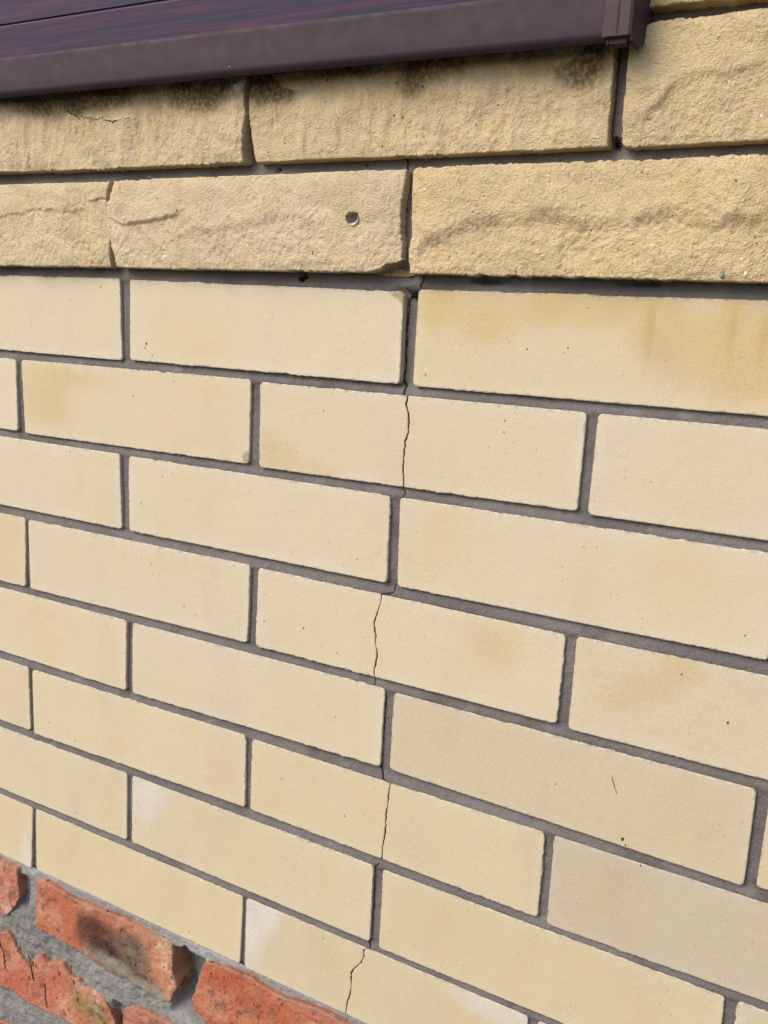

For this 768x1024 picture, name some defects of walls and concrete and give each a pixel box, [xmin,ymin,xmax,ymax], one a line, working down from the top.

crack [402,276,424,496]
crack [346,583,396,1021]